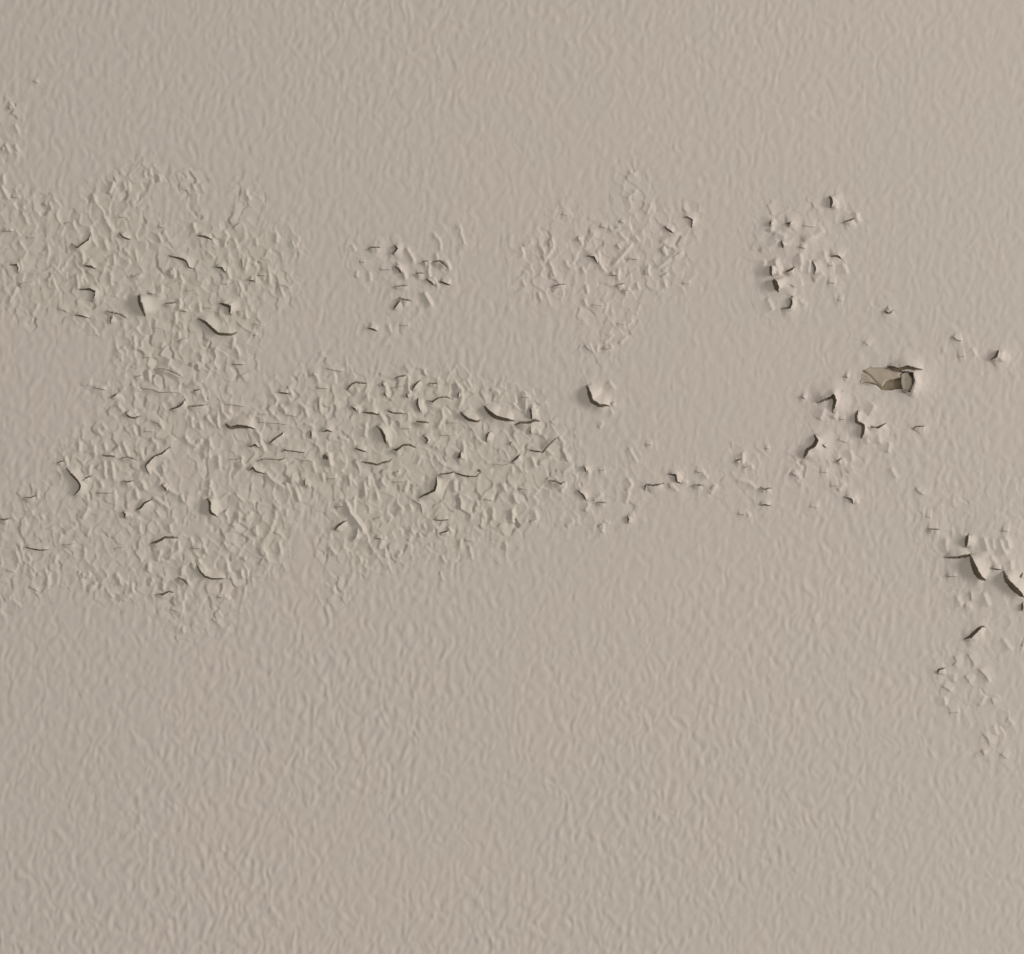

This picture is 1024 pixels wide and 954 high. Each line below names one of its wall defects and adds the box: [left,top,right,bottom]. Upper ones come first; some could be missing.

peeling [0,151,1024,667]